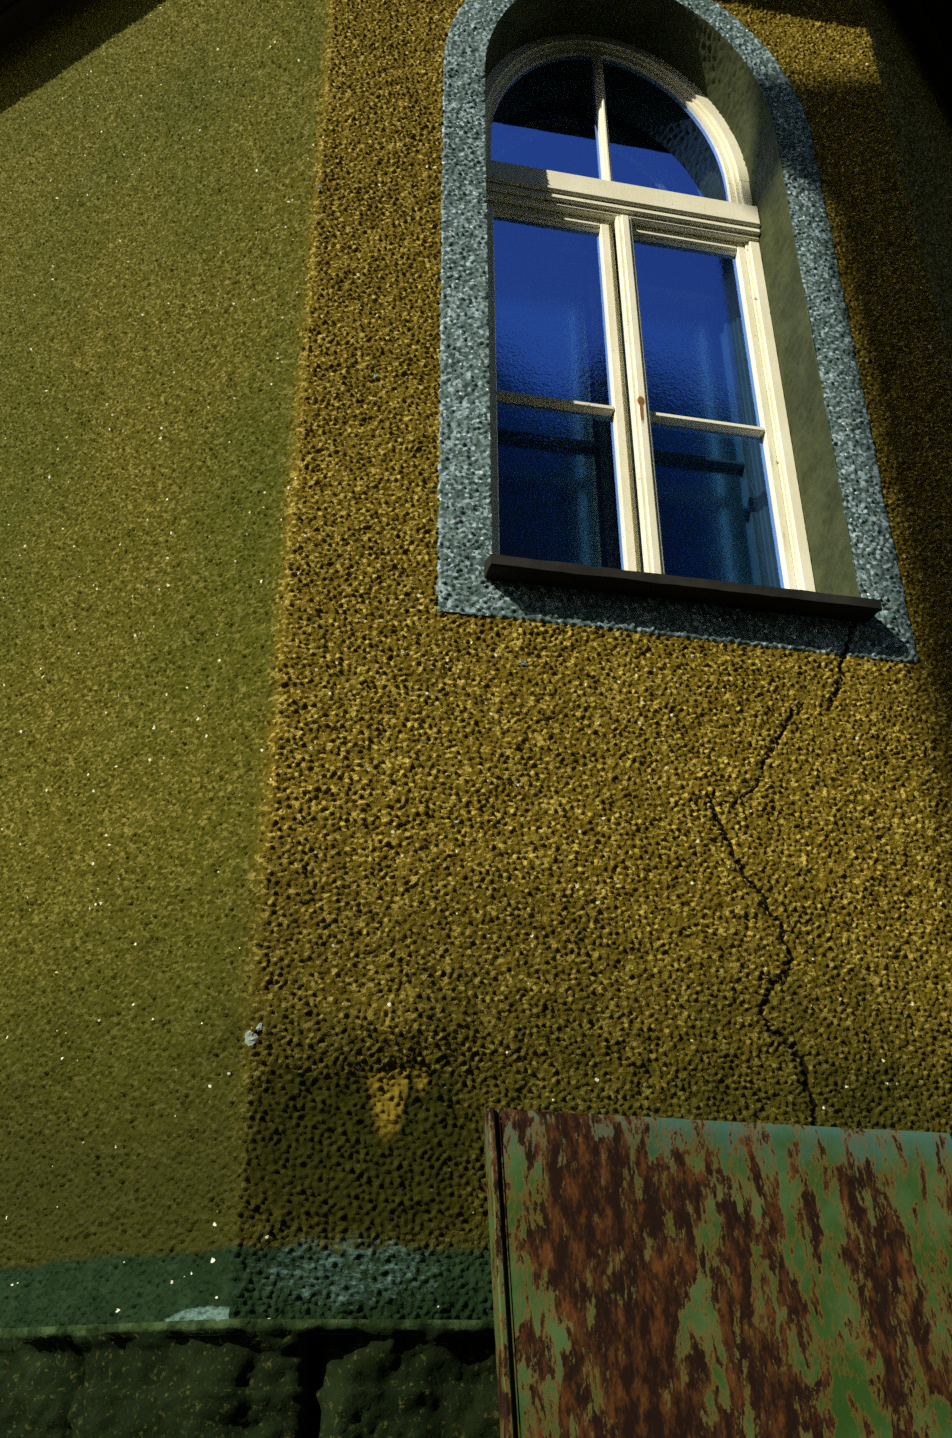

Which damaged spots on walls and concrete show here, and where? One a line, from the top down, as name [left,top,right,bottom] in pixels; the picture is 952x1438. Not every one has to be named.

crack [704,623,856,1126]